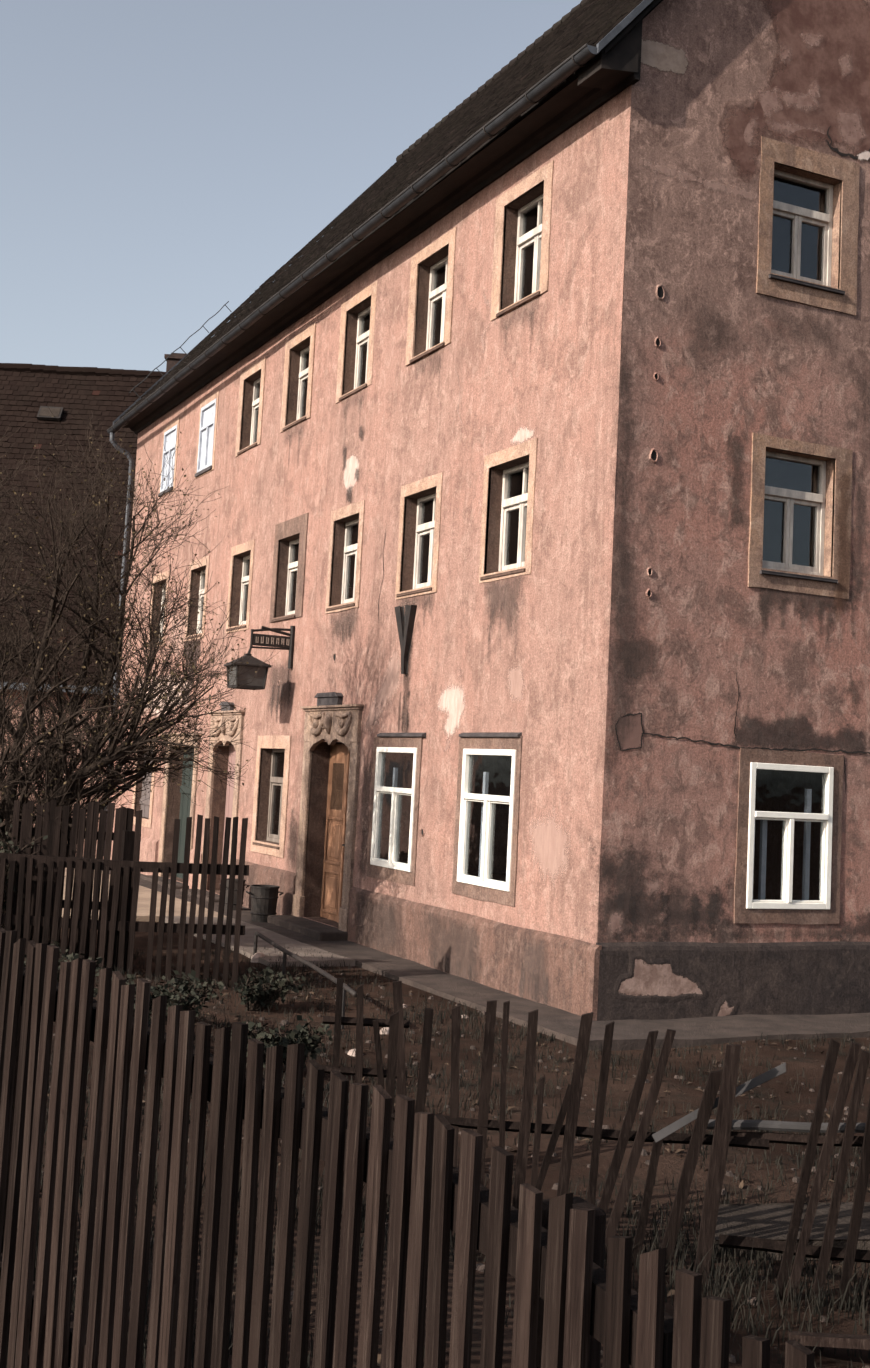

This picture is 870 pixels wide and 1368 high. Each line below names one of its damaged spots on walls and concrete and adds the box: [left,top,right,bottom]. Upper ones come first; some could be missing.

crack [825,126,870,160]
flaking render [438,669,465,751]
crack [615,673,870,791]
damp [731,716,864,752]
flaking render [612,948,739,1017]